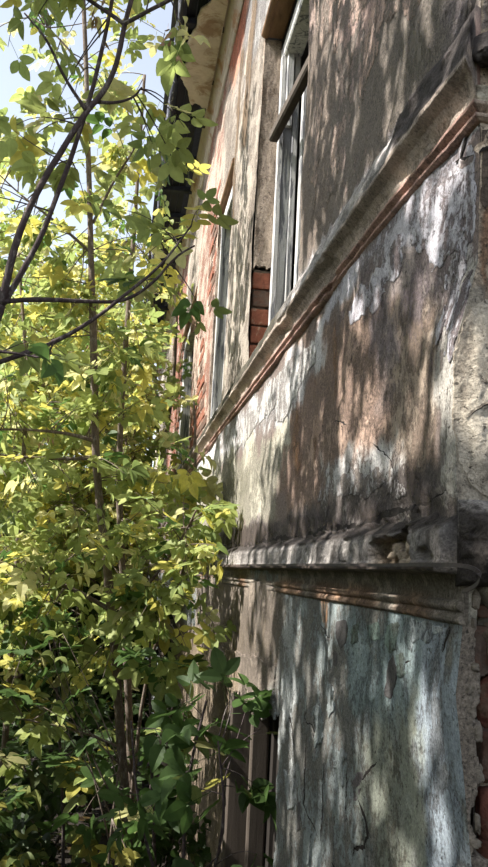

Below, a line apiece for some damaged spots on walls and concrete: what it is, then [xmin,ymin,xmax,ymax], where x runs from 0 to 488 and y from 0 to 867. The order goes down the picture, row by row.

crack [463,0,476,22]
peeling [312,0,420,110]
peeling [348,129,488,363]
crack [465,402,488,419]
damp [405,463,431,514]
damp [219,523,279,547]
spalling [387,542,411,563]
peeling [333,616,447,699]
peeling [312,683,335,748]
spalling [467,589,488,859]
peeling [283,769,312,866]
peeling [333,748,365,846]